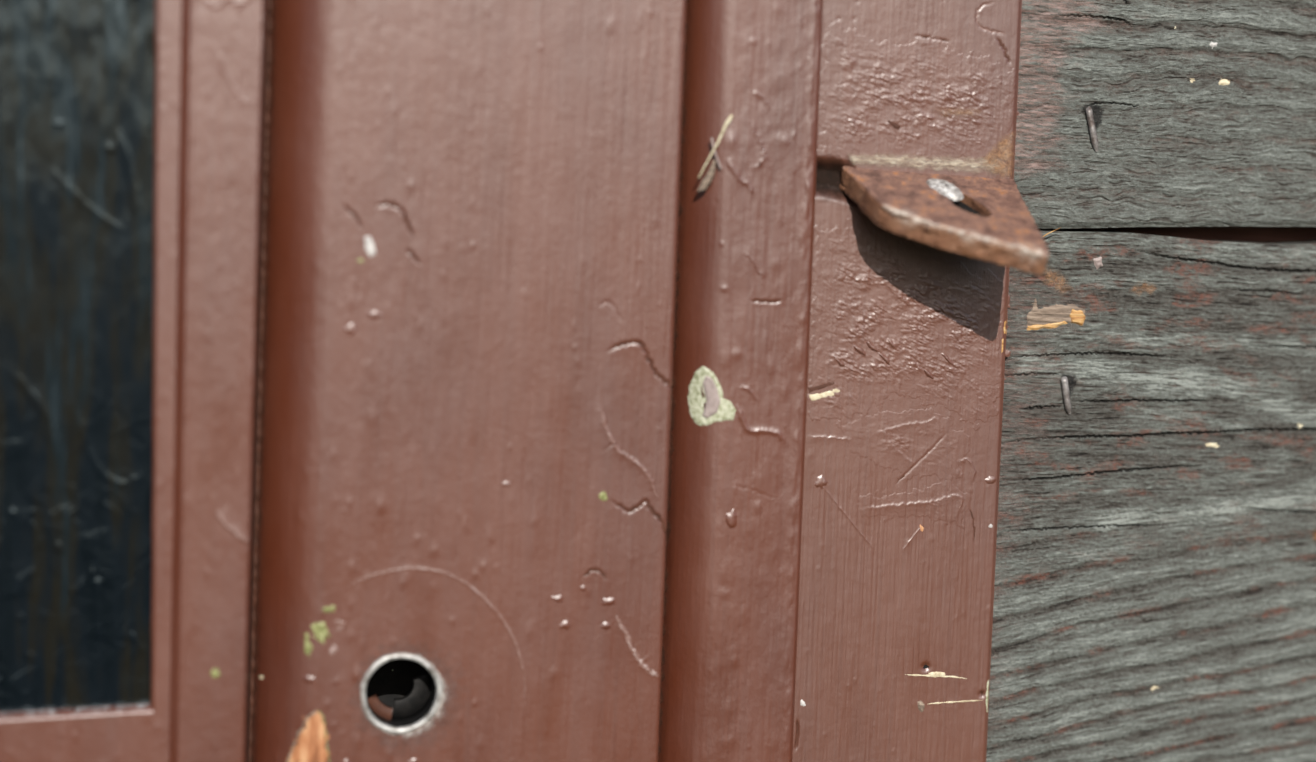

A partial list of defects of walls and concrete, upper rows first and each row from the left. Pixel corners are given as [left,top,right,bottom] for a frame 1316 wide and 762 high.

crack [607,341,671,388]
peeling [687,366,736,426]
peeling [286,710,331,762]